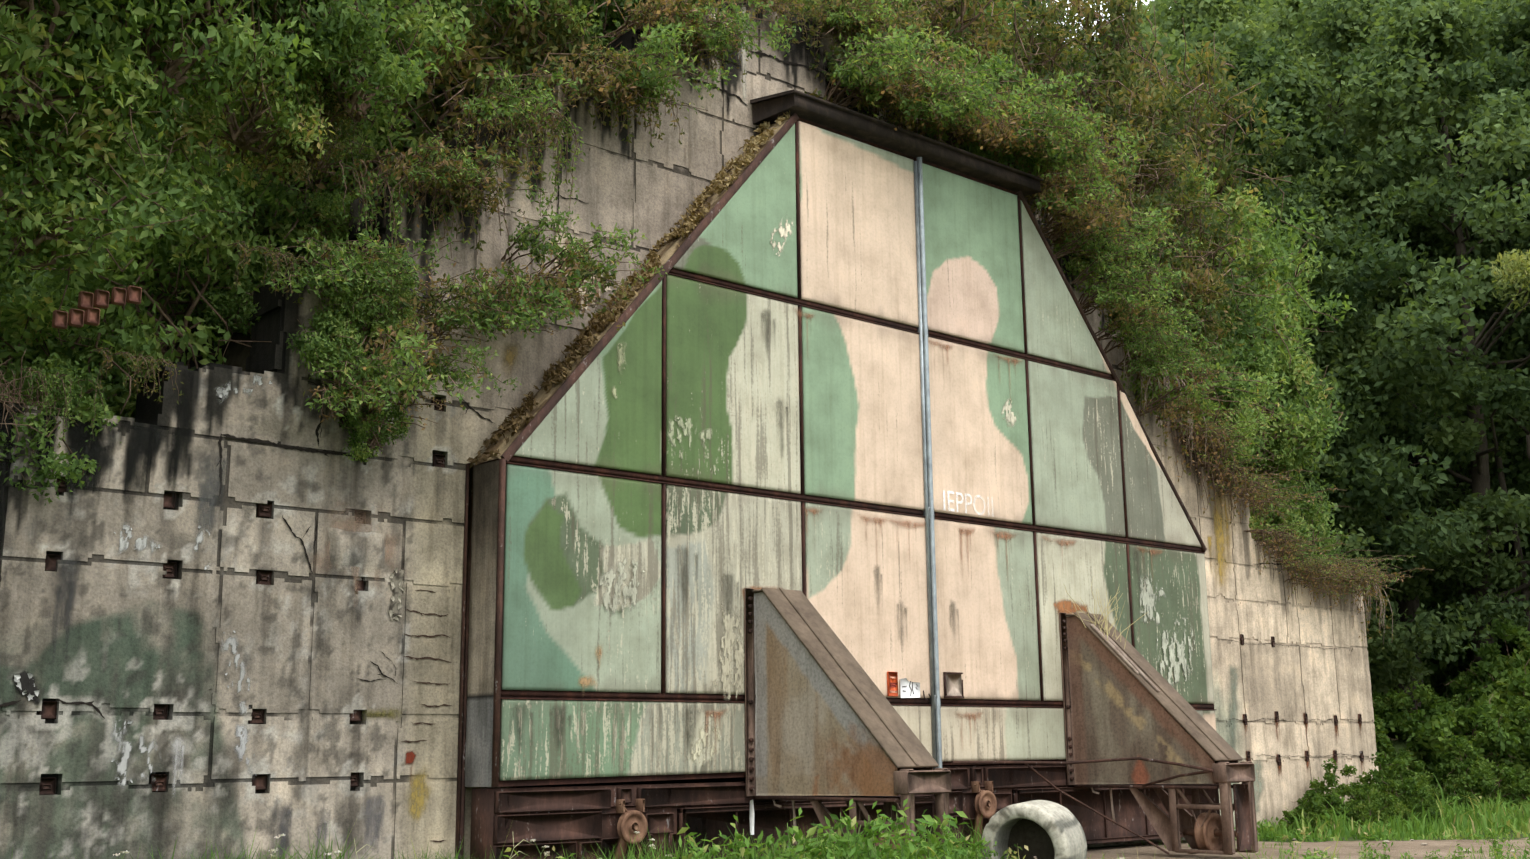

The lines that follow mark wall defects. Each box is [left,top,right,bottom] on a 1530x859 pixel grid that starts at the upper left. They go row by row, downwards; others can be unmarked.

leakage [0,409,13,538]
leakage [31,374,193,503]
crack [282,515,318,574]
leakage [54,560,76,645]
rust [1054,600,1088,614]
peeling [1140,575,1195,686]
spalling [12,671,40,704]
peeling [111,721,154,786]